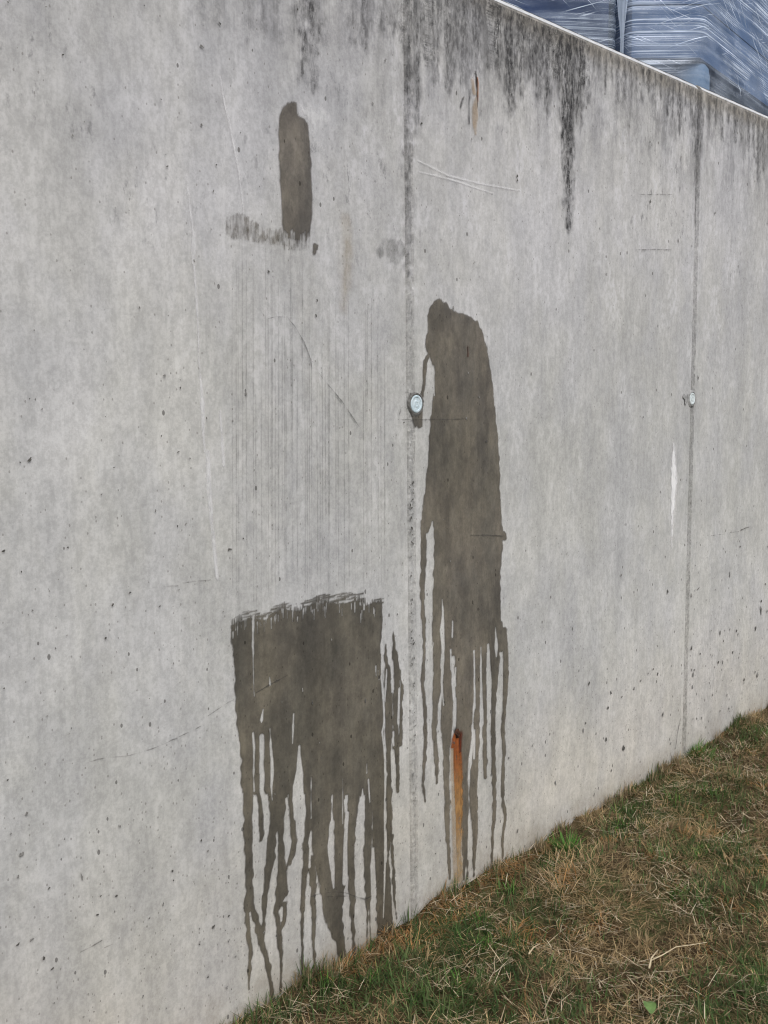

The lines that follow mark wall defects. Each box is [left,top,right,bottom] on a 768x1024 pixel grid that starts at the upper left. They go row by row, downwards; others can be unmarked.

water stain [233,102,325,254]
water stain [463,1,585,229]
water stain [413,299,509,880]
water stain [231,593,404,1004]
rust [451,729,463,884]